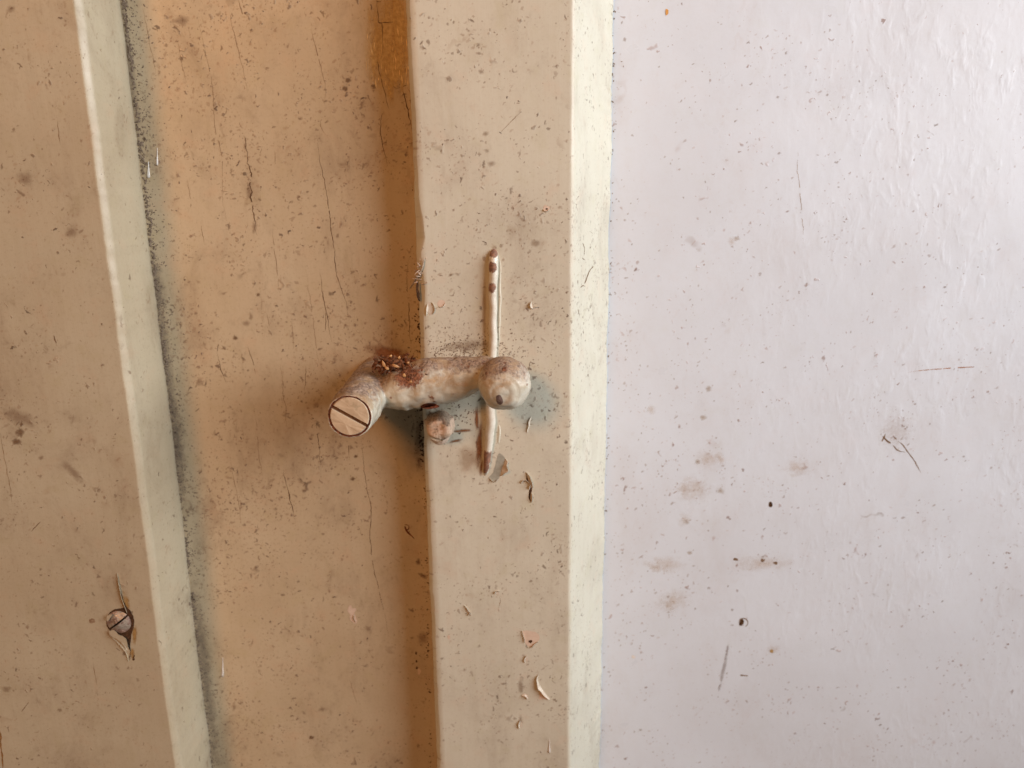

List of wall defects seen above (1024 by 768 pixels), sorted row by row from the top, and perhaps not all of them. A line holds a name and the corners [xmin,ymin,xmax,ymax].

crack [178,22,279,287]
peeling [489,453,509,482]
peeling [522,676,550,700]